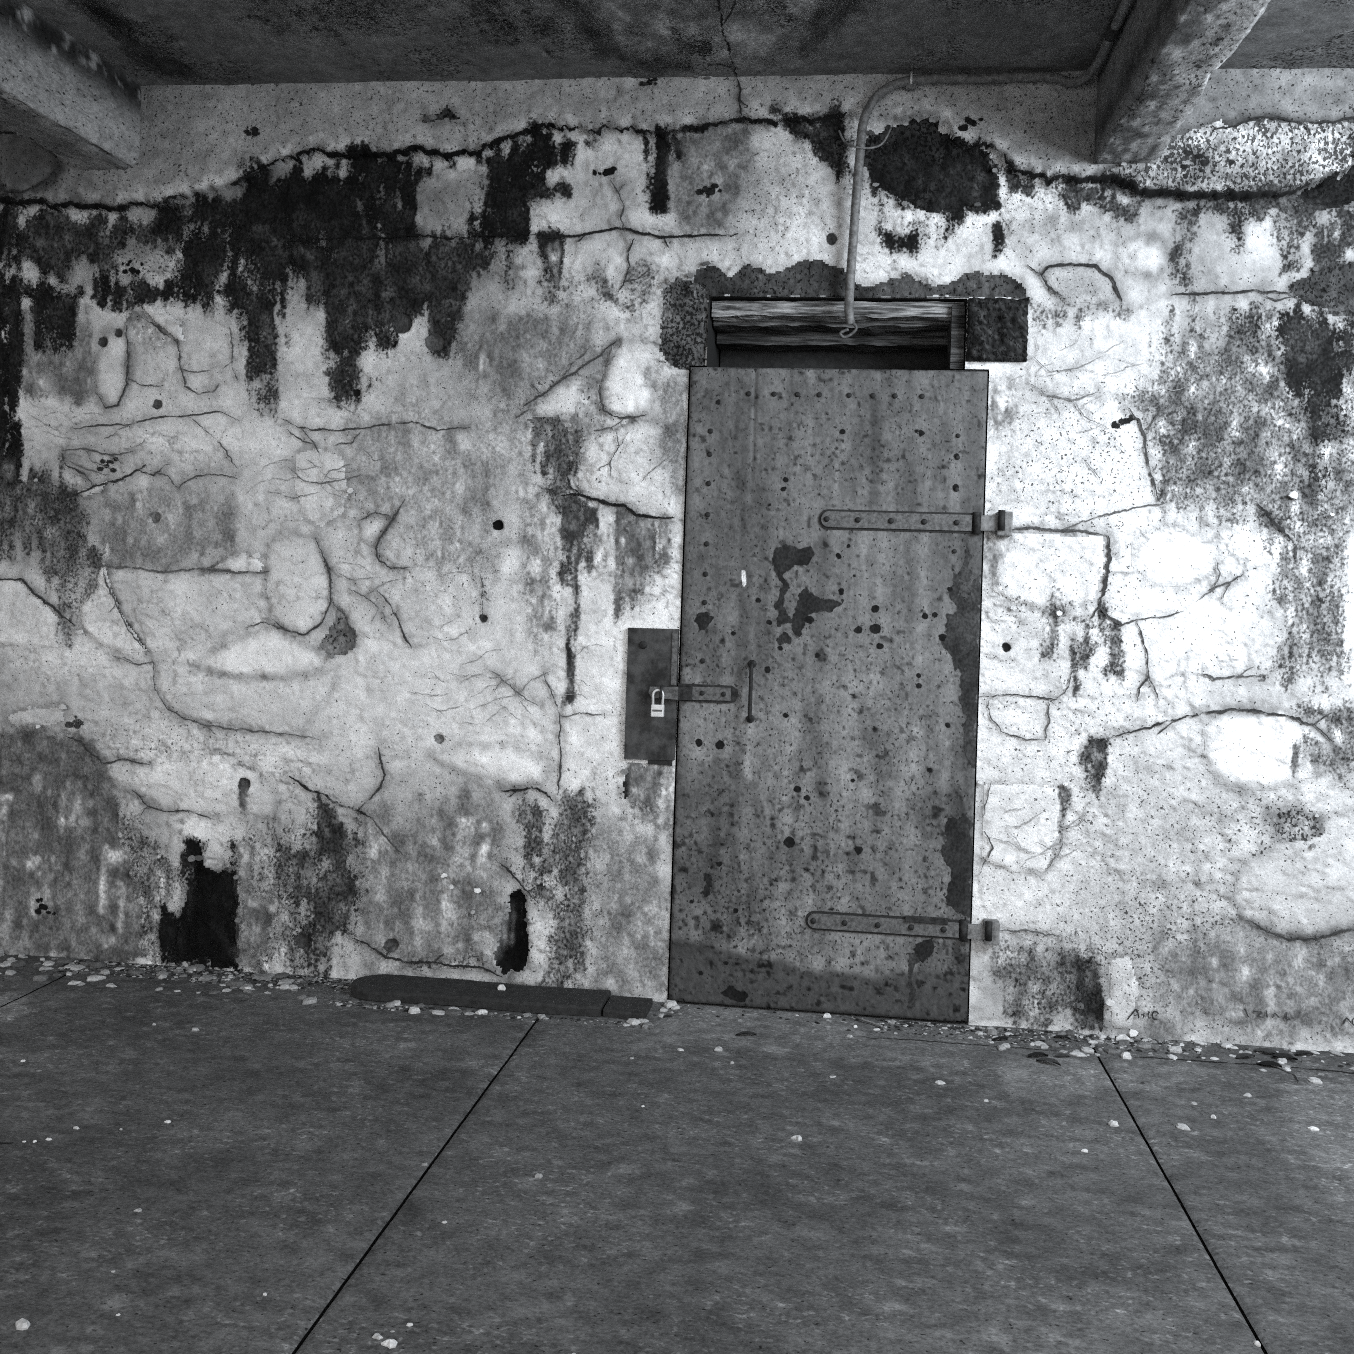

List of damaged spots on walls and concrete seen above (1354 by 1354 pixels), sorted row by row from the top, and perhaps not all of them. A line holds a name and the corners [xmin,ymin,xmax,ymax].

crack [979,141,1310,202]
spalling [1091,118,1354,210]
crack [1027,262,1122,308]
water stain [0,118,672,707]
crack [516,340,674,519]
water stain [644,373,689,491]
water stain [769,98,1354,780]
crack [15,315,604,802]
crack [1012,324,1334,742]
spalling [0,839,317,1005]
water stain [0,724,673,996]
spalling [383,889,530,990]